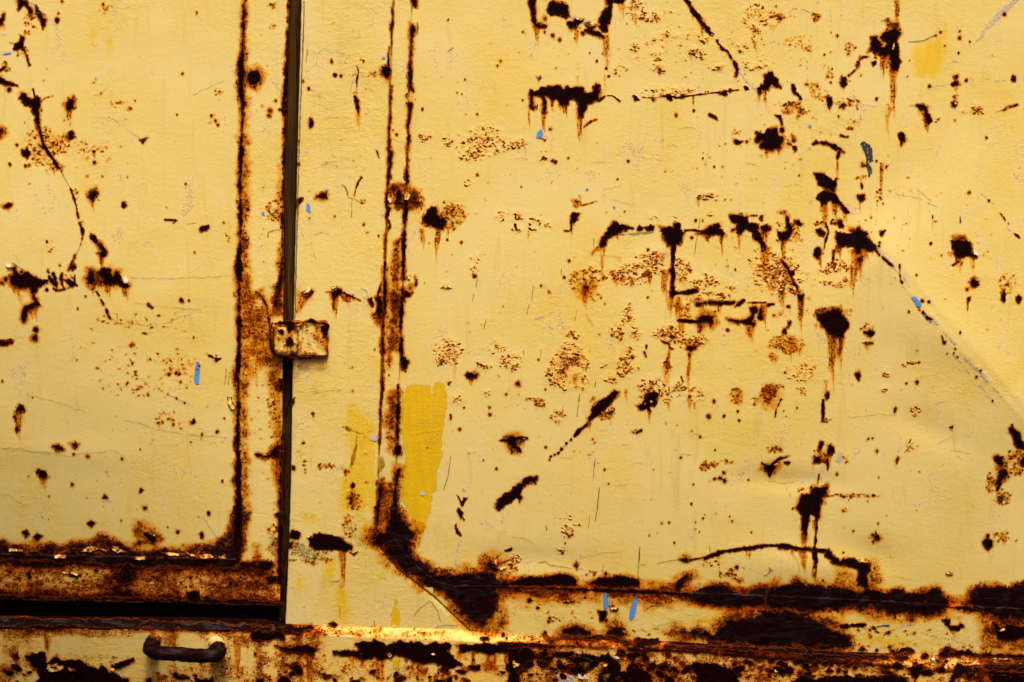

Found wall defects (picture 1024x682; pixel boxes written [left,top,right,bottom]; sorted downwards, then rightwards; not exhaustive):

corrosion [0,0,221,396]
corrosion [326,2,466,456]
corrosion [522,0,910,423]
corrosion [877,350,921,395]
corrosion [544,389,620,461]
corrosion [986,424,1024,504]
corrosion [455,488,468,536]
corrosion [494,475,539,511]
corrosion [552,512,582,556]
corrosion [982,532,1017,551]
corrosion [3,636,135,682]
corrosion [139,663,215,682]